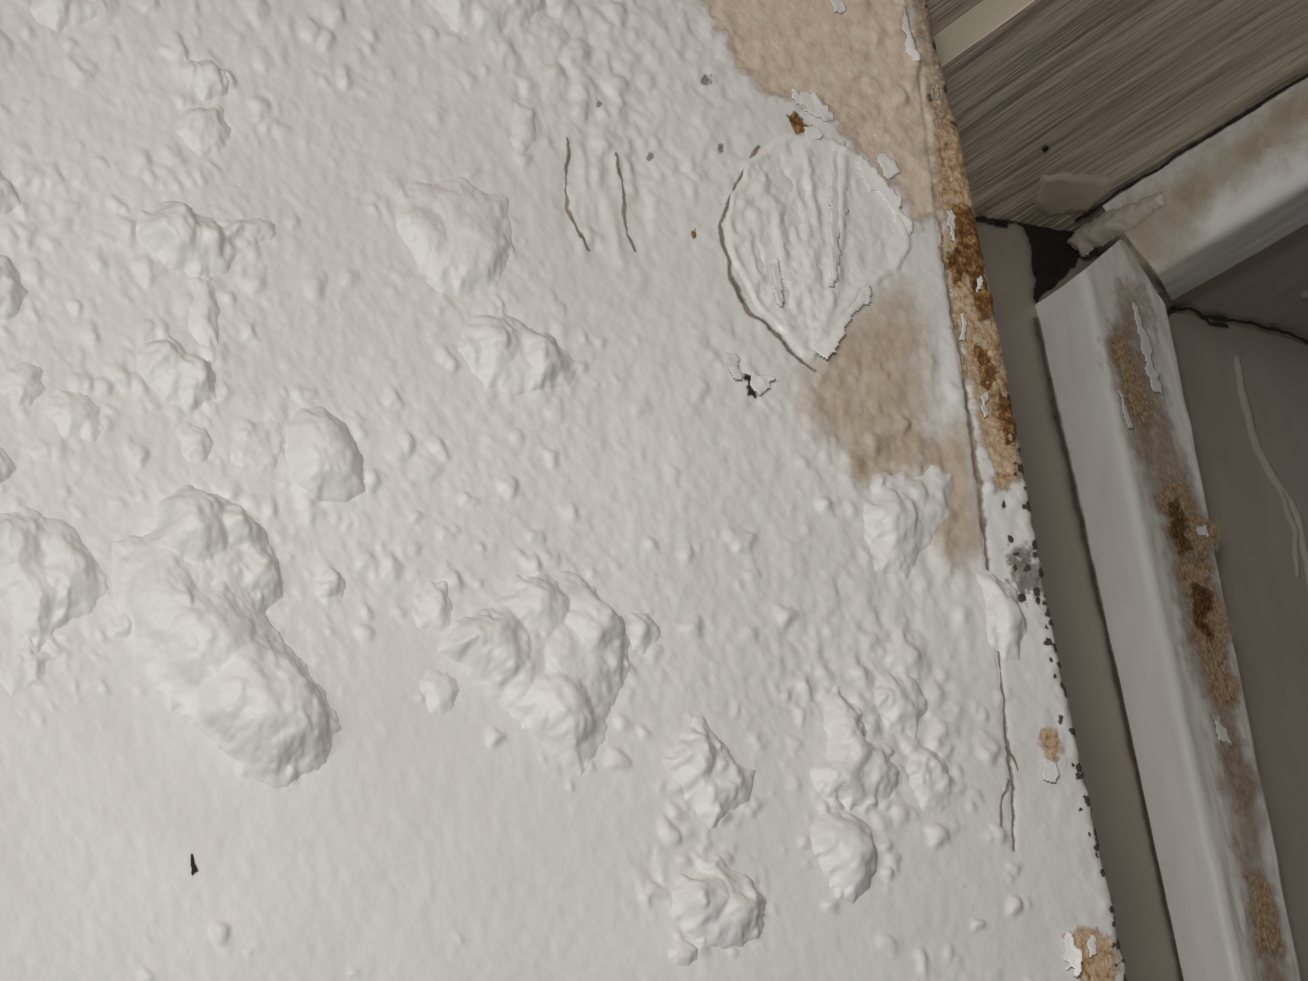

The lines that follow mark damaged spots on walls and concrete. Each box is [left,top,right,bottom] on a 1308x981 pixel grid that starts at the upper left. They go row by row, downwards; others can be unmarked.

crack [564,137,590,251]
crack [615,153,636,251]
peeling [703,0,945,372]
damp [819,303,975,558]
damp [1014,432,1032,512]
damp [1006,535,1067,698]
crack [997,650,1018,851]
damp [1088,828,1105,877]
damp [1109,901,1127,981]